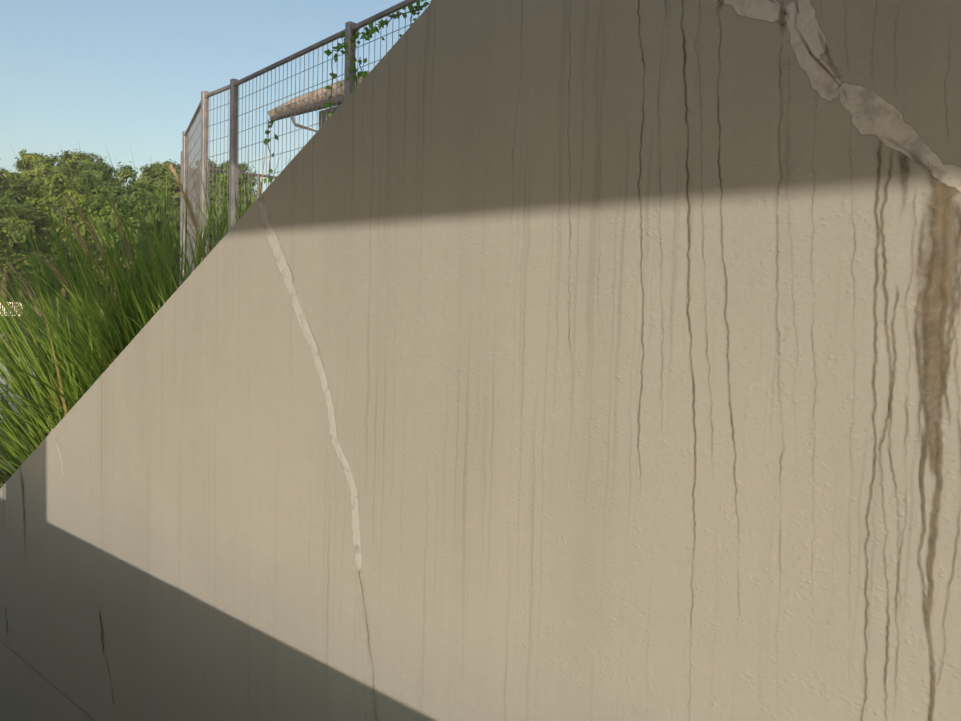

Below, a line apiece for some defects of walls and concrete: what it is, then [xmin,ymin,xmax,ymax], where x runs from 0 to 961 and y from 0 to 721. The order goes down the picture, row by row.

crack [722,0,961,192]
crack [259,198,362,583]
corrosion [865,146,908,550]
corrosion [915,174,961,721]
corrosion [885,587,898,694]